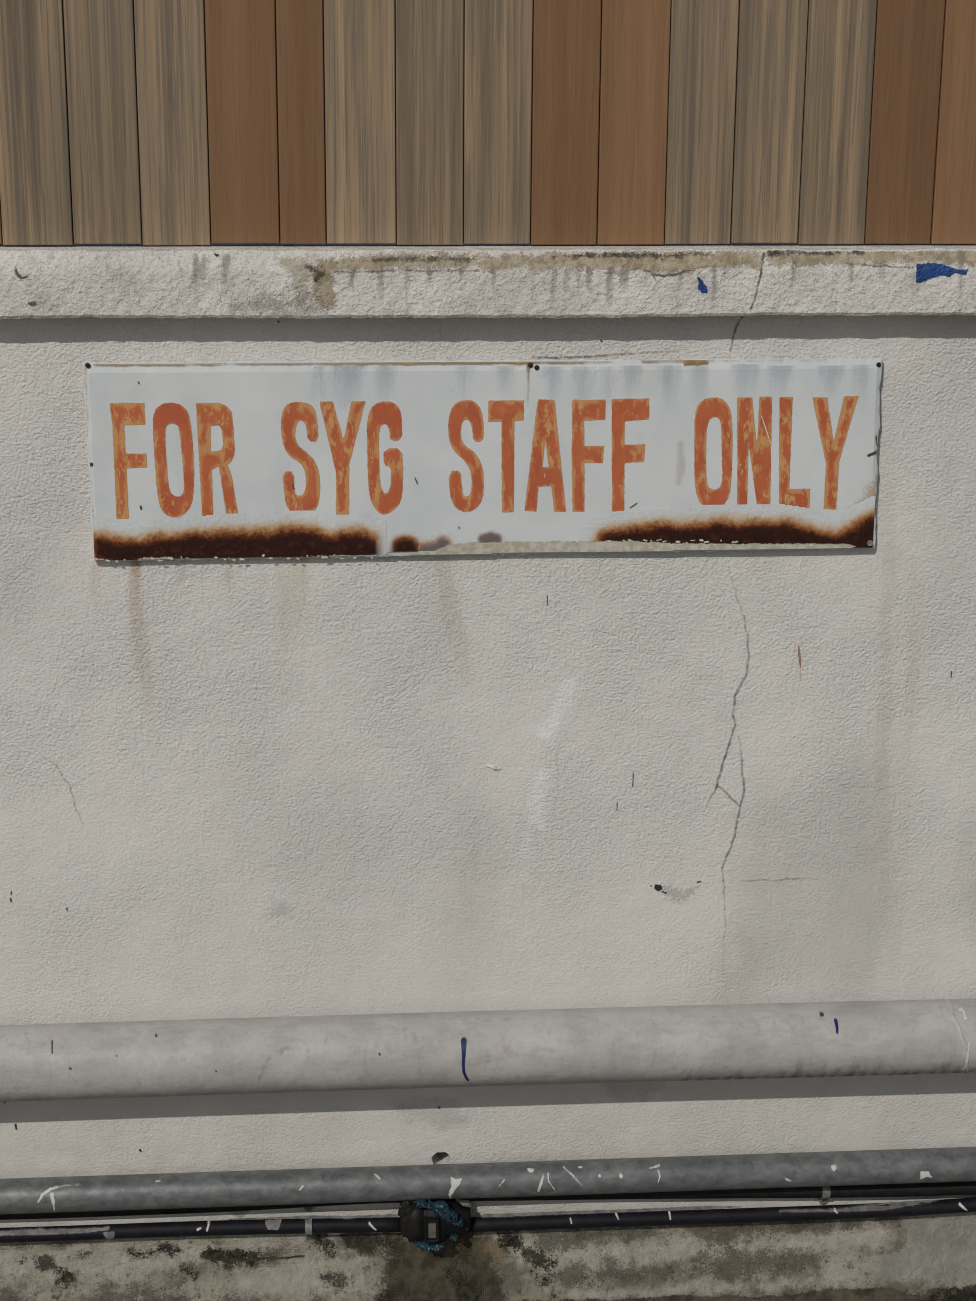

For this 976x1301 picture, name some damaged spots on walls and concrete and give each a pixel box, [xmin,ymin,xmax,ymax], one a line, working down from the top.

leakage [305,250,976,282]
crack [730,253,766,351]
crack [713,643,748,868]
leakage [20,1251,91,1289]
leakage [94,1241,274,1301]
leakage [296,1226,670,1301]
leakage [683,1217,897,1281]